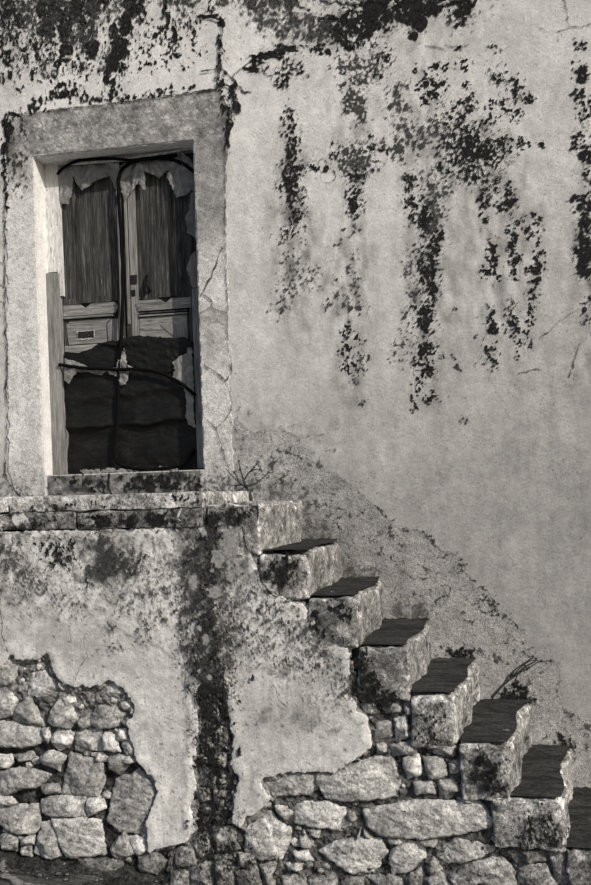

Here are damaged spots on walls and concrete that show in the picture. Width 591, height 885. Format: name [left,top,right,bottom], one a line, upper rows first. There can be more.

water stain [0,0,178,86]
crack [295,0,403,20]
crack [0,118,20,497]
crack [29,15,269,475]
water stain [0,466,403,885]
flaking render [0,656,569,885]
flaking render [229,407,591,788]